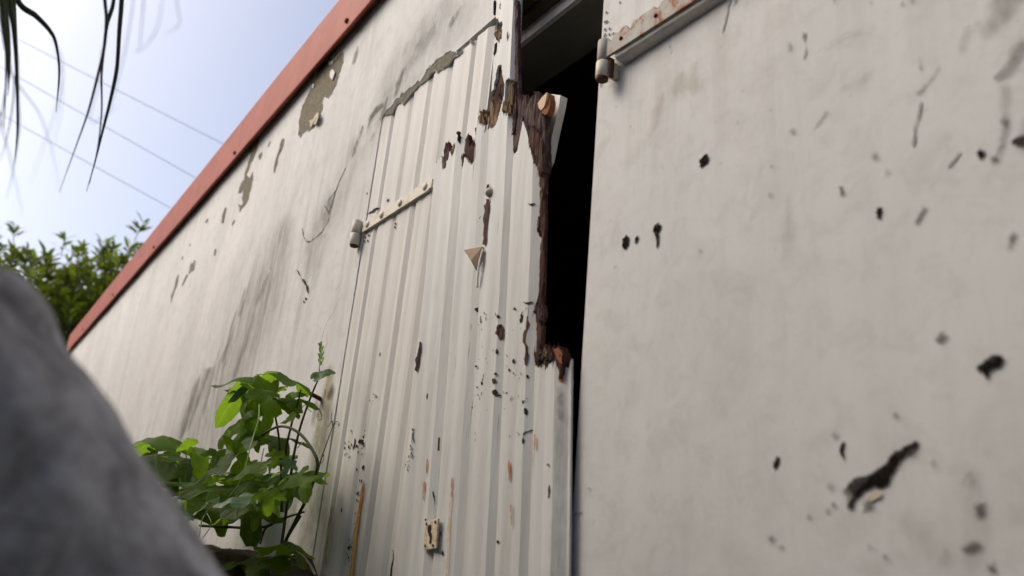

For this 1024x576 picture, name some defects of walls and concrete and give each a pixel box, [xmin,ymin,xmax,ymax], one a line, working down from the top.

peeling [298,51,344,138]
spalling [385,39,473,116]
peeling [221,138,285,226]
peeling [472,302,534,416]
spalling [976,355,1003,379]
spalling [827,441,918,513]
rust [349,482,364,576]